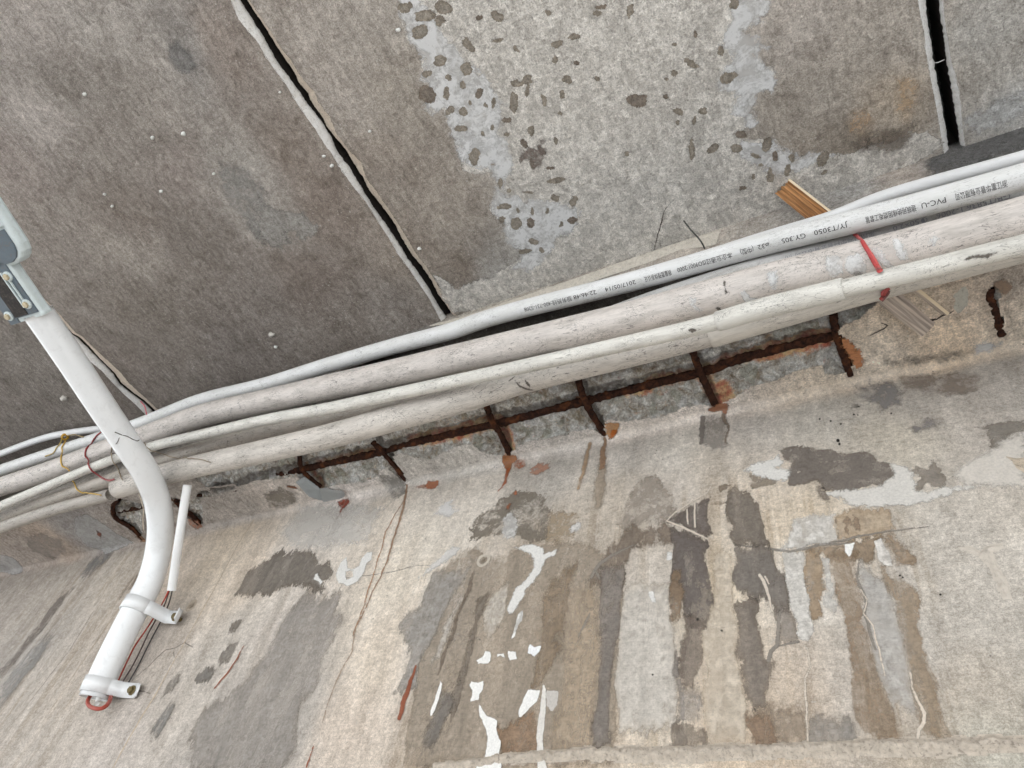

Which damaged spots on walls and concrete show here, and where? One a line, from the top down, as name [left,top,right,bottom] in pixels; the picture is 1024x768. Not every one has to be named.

rust [497,455,550,510]
spalling [170,302,883,529]
rust [577,423,619,508]
rust [699,403,729,448]
rust [839,337,863,369]
leakage [188,547,372,768]
leakage [393,421,1024,768]
crack [734,526,929,741]